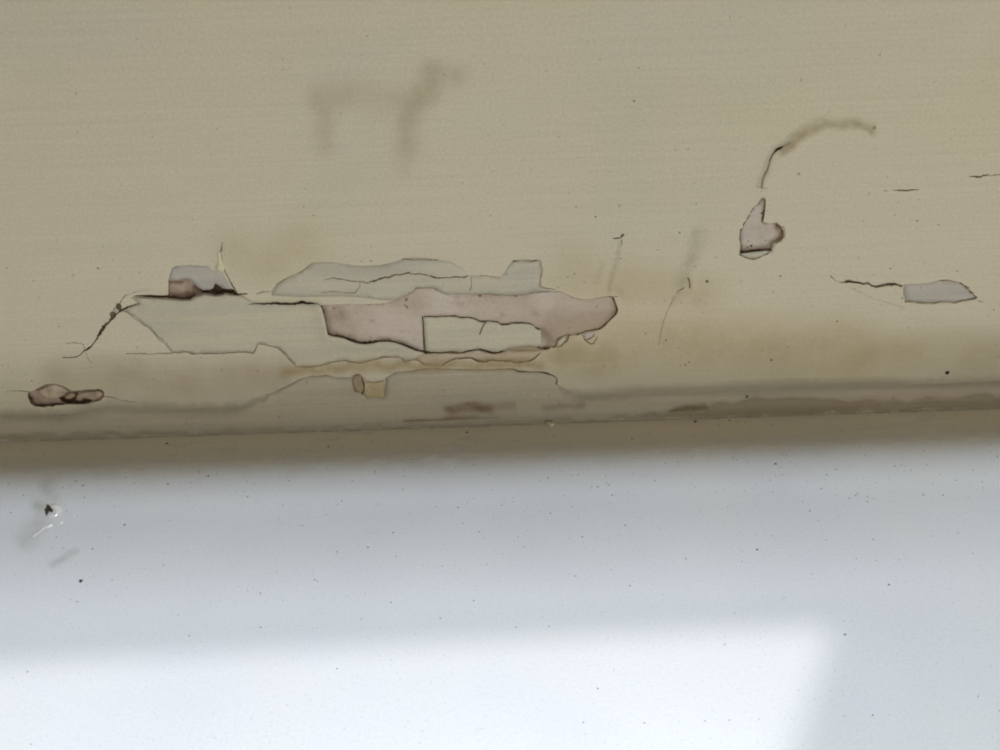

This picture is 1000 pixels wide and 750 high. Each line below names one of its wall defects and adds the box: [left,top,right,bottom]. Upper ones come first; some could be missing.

peeling [739,198,786,260]
peeling [136,242,618,367]
crack [830,276,904,308]
peeling [903,280,984,304]
crack [62,289,150,362]
peeling [7,384,140,407]
peeling [352,375,385,399]